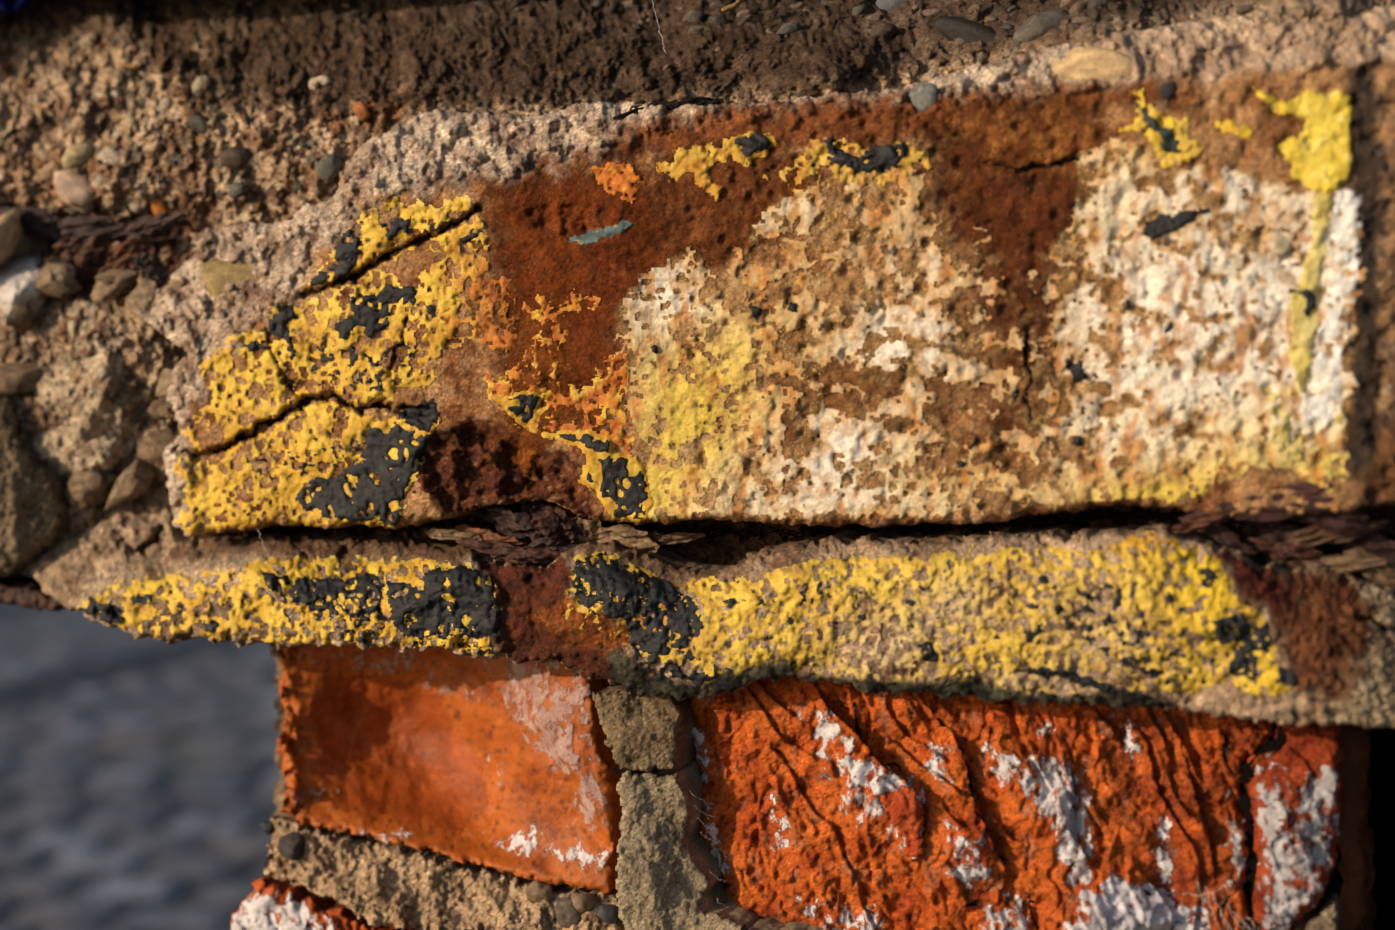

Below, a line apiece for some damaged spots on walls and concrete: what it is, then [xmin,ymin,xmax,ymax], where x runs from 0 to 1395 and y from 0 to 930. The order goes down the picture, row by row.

crack [303,206,481,295]
crack [177,318,407,458]
water stain [606,650,1163,759]
water stain [483,658,613,868]
water stain [692,727,709,783]
water stain [704,802,730,875]
water stain [770,794,790,851]
water stain [797,698,954,859]
water stain [945,822,992,889]
water stain [979,741,1340,930]
water stain [231,891,334,930]
water stain [796,896,885,930]